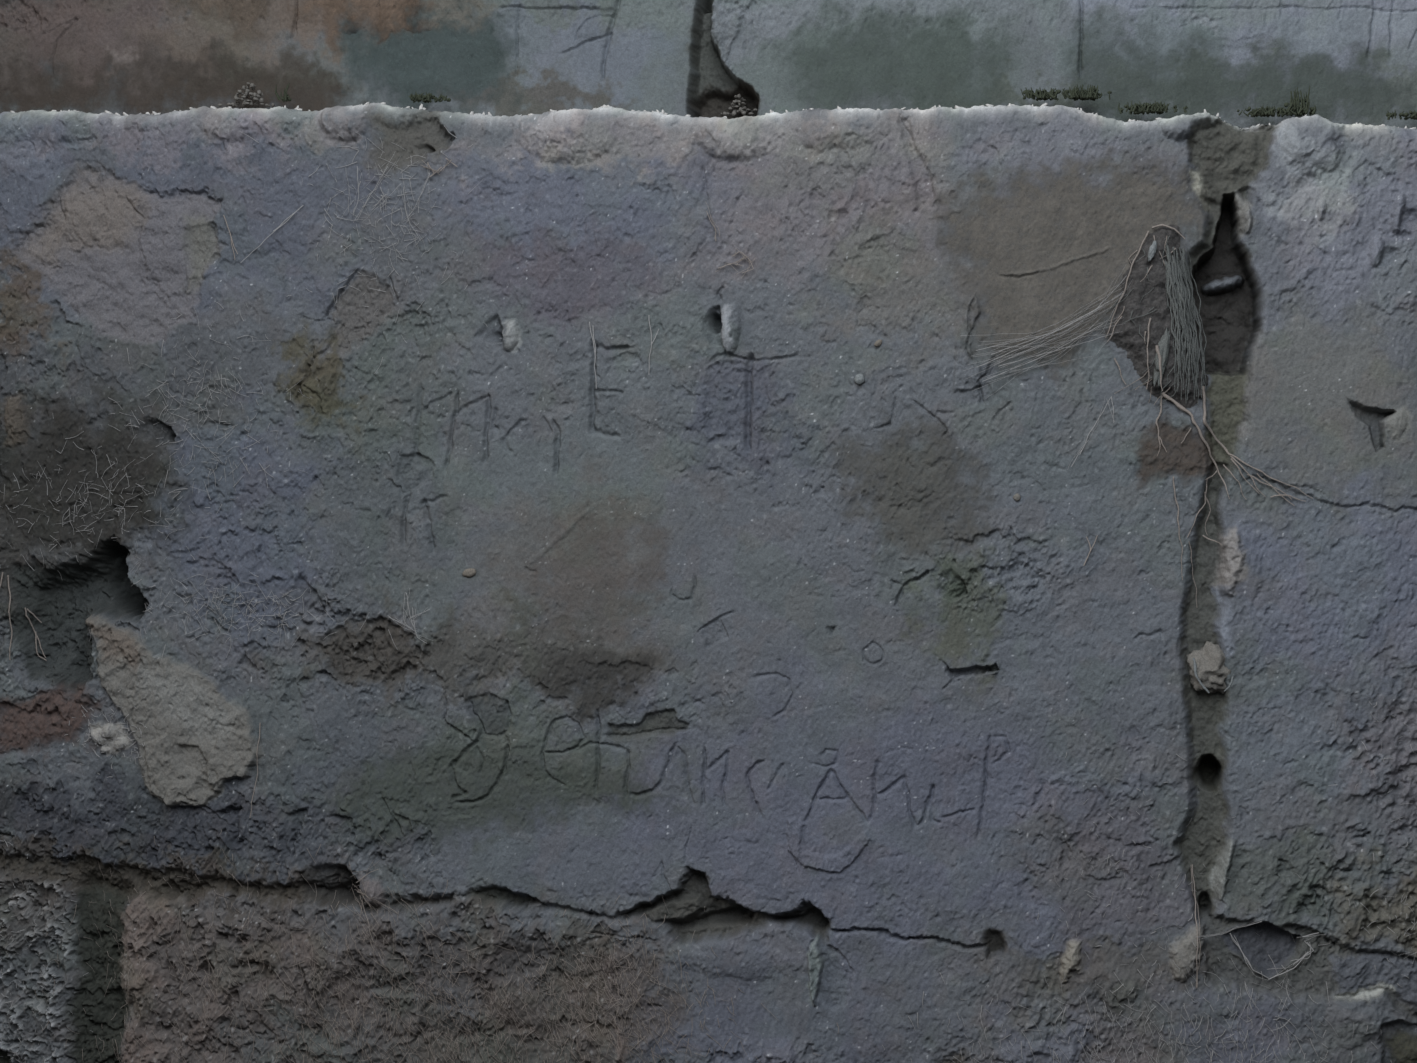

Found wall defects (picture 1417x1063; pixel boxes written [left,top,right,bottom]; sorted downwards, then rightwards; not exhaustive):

flaking render [0,534,265,808]
spalling [1379,1020,1417,1063]